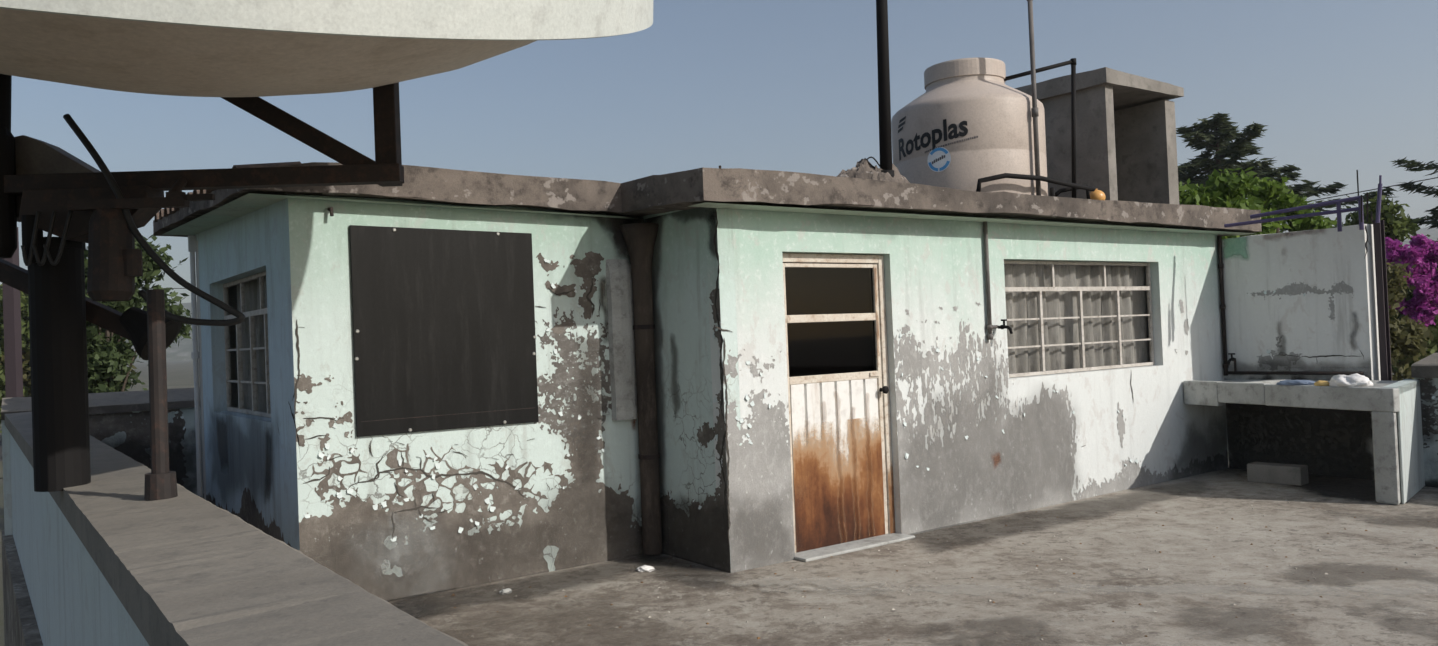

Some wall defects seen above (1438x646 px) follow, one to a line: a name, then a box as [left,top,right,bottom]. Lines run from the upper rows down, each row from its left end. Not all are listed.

crack [277,321,531,540]
peeling [203,251,643,602]
peeling [660,288,795,573]
corrosion [793,418,896,552]
peeling [893,299,1229,535]
peeling [1258,333,1301,371]
peeling [1247,281,1354,321]
peeling [1417,378,1438,455]